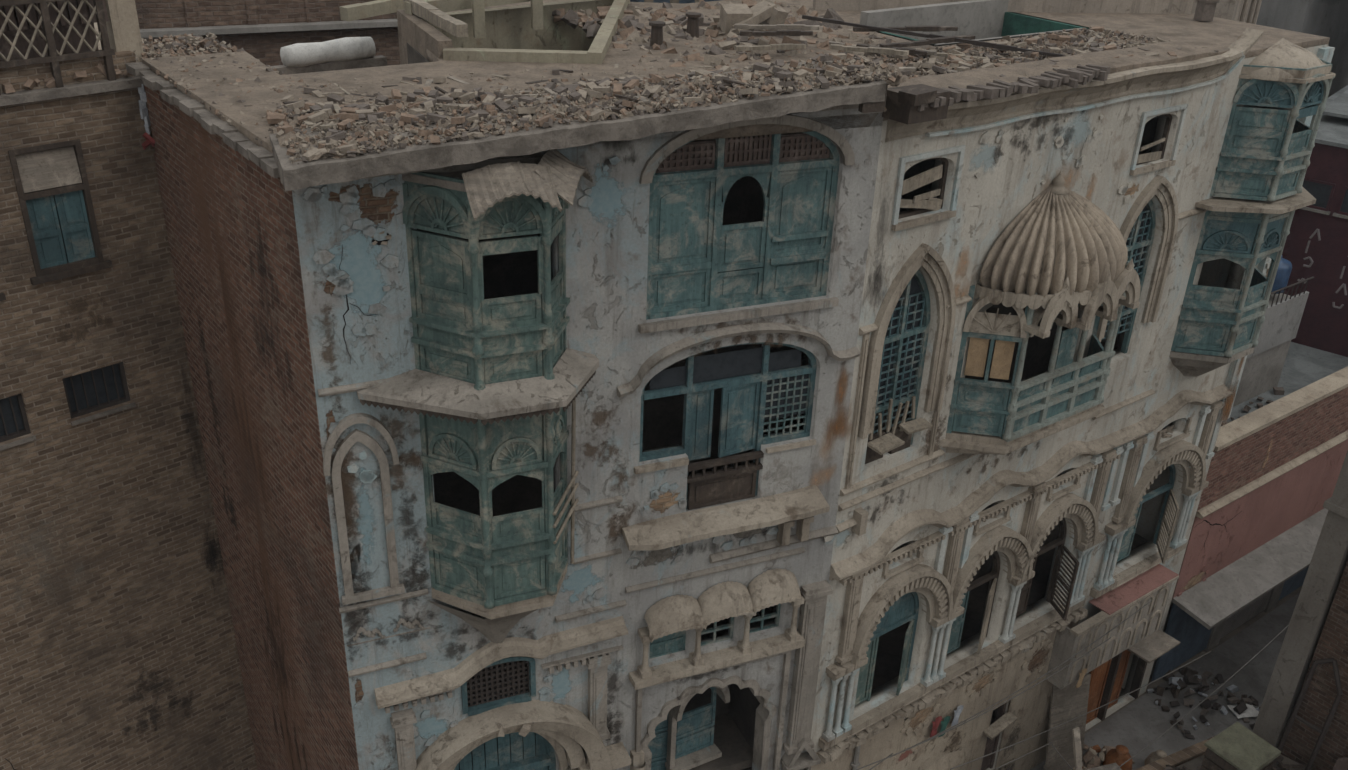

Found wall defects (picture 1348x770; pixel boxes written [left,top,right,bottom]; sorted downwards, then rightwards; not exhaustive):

peeling [302,179,403,336]
crack [339,245,375,355]
water stain [321,307,341,407]
corrosion [828,371,849,438]
water stain [325,446,359,535]
water stain [376,412,423,540]
flaking render [644,482,687,514]
flaking render [626,545,684,569]
water stain [338,555,486,660]